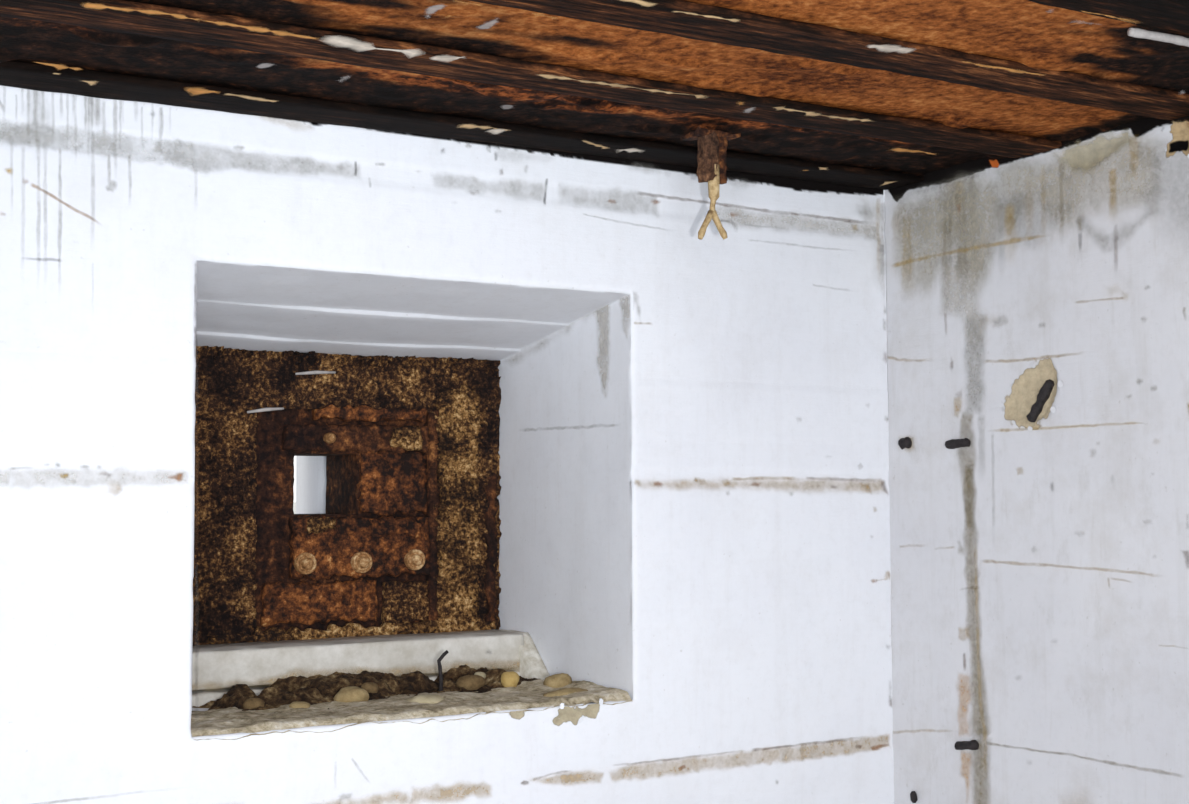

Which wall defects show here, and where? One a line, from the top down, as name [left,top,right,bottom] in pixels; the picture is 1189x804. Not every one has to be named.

spalling [377,124,697,175]
peeling [775,107,871,122]
spalling [726,116,1189,202]
corrosion [196,346,499,375]
spalling [1001,358,1063,431]
water stain [964,459,986,804]